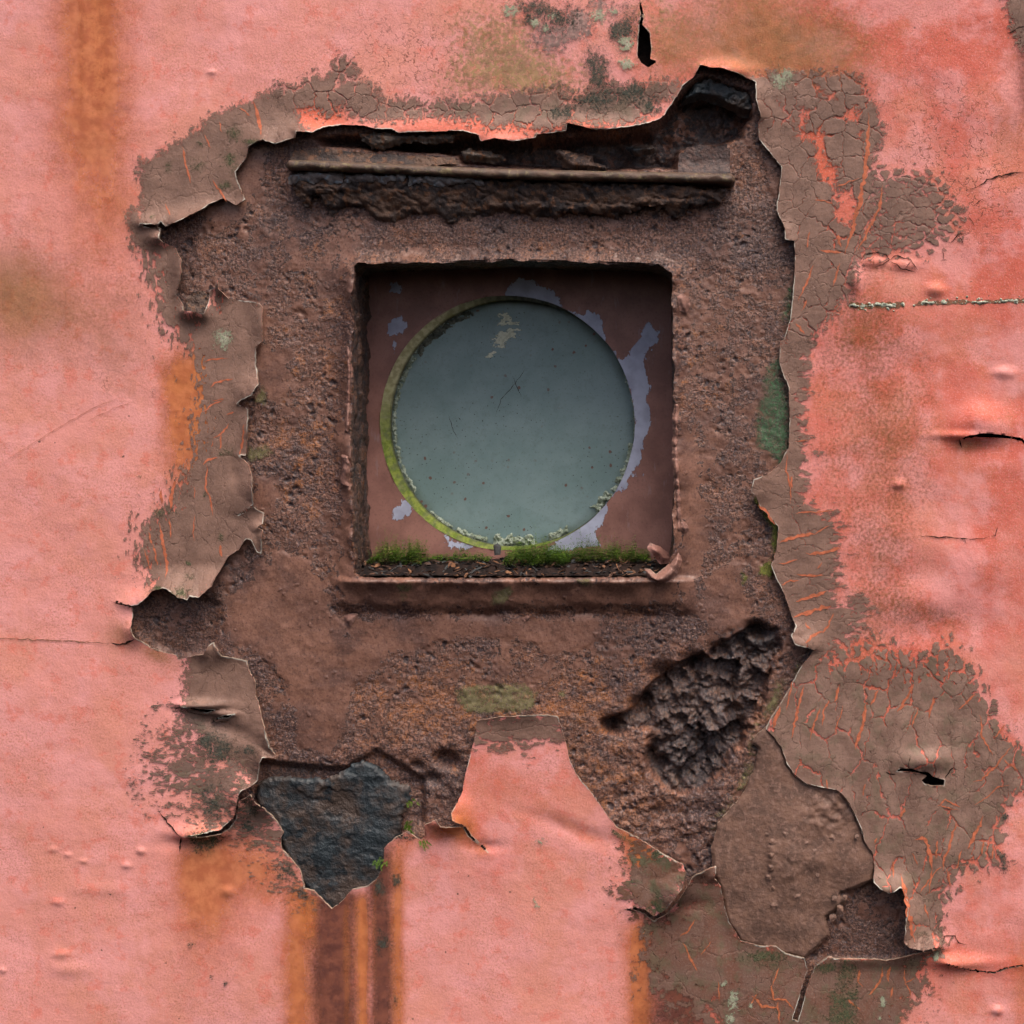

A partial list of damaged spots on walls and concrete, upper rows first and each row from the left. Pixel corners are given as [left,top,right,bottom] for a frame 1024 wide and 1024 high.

corrosion [61,0,123,222]
water stain [509,0,581,34]
water stain [550,5,662,119]
crack [852,252,918,273]
crack [942,172,1019,261]
peeling [111,50,687,648]
corrosion [162,354,216,472]
crack [959,433,1024,447]
peeling [603,60,1024,1024]
water stain [189,779,224,854]
peeling [126,642,322,916]
corrosion [287,848,403,1024]